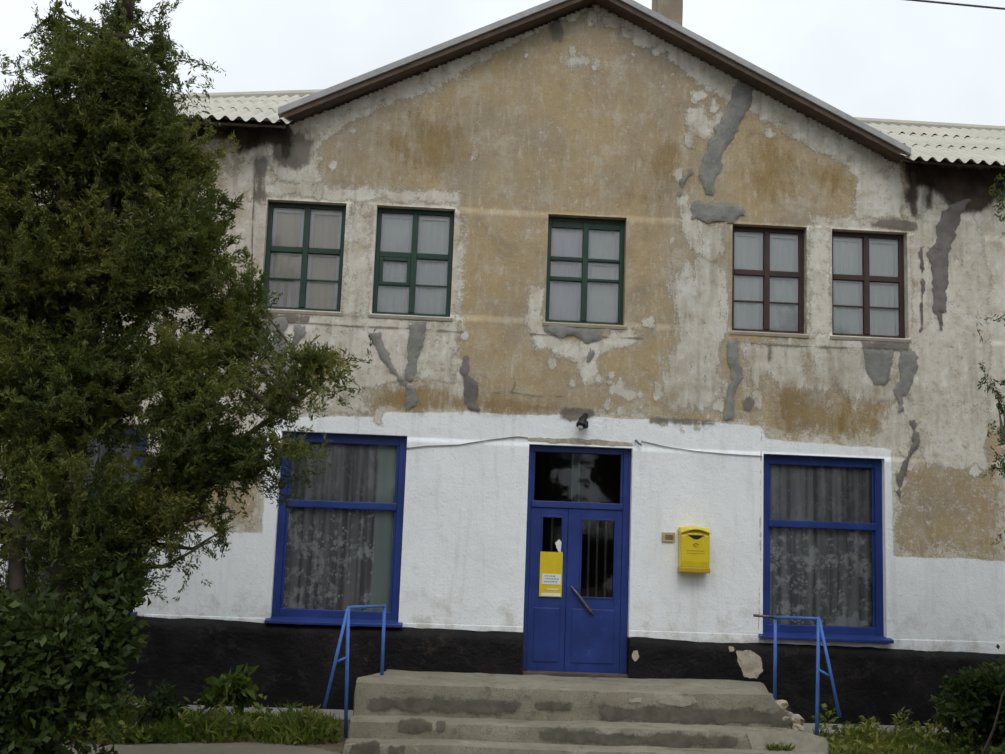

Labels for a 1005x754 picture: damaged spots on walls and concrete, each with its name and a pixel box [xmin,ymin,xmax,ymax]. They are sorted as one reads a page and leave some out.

damp [184,124,314,200]
peeling [246,5,994,479]
flaking render [729,646,763,678]